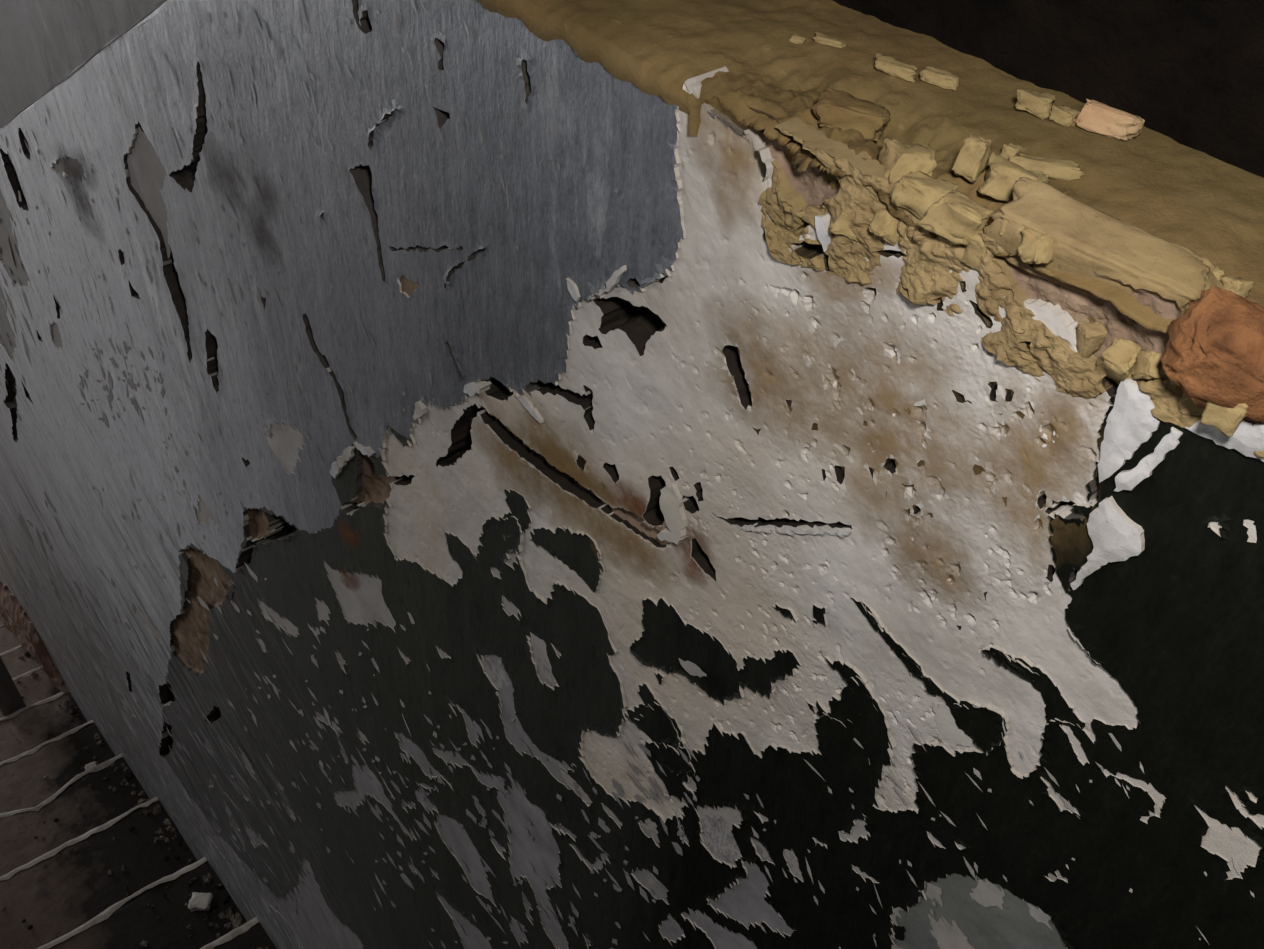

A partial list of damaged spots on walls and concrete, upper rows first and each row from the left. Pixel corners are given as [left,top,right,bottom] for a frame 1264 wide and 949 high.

spalling [874,53,960,91]
peeling [0,127,49,439]
crack [397,246,485,272]
peeling [79,337,167,428]
crack [352,455,415,505]
crack [452,382,513,458]
spalling [220,66,1264,949]
leakage [861,381,947,477]
leakage [1008,410,1080,523]
crack [165,508,297,754]
peeling [186,561,415,676]
peeling [0,513,363,949]